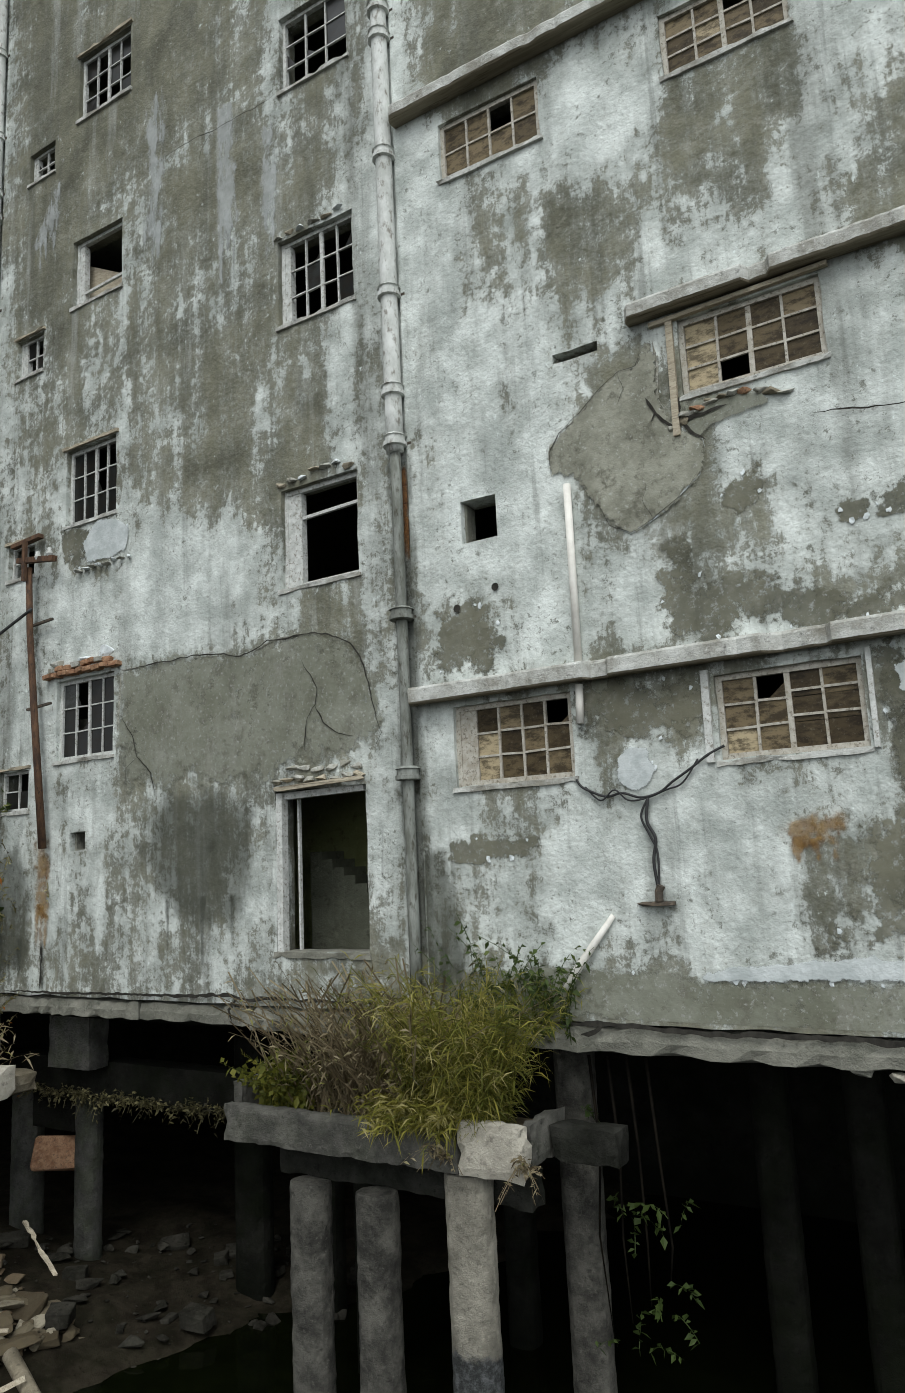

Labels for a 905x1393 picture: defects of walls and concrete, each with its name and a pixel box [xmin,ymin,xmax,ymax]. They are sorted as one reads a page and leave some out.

water stain [35,183,60,268]
water stain [143,95,164,257]
water stain [217,103,237,283]
crack [820,401,905,412]
peeling [835,475,905,524]
peeling [433,593,506,680]
peeling [655,533,905,643]
crack [120,632,381,752]
crack [120,715,155,792]
peeling [435,637,905,1033]
rust [788,814,845,862]
rust [34,840,50,946]